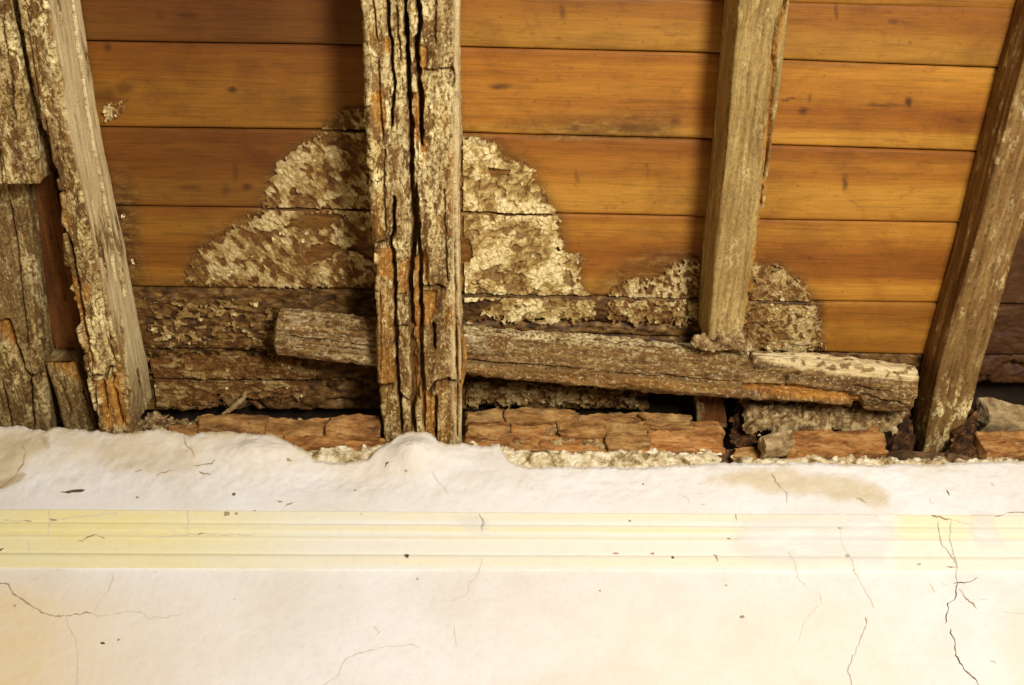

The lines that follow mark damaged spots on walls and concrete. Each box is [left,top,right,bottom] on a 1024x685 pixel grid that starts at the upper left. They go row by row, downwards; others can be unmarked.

flaking render [462,380,1024,468]
damp [731,472,878,500]
crack [0,569,183,685]
crack [840,529,874,685]
crack [929,491,1024,684]